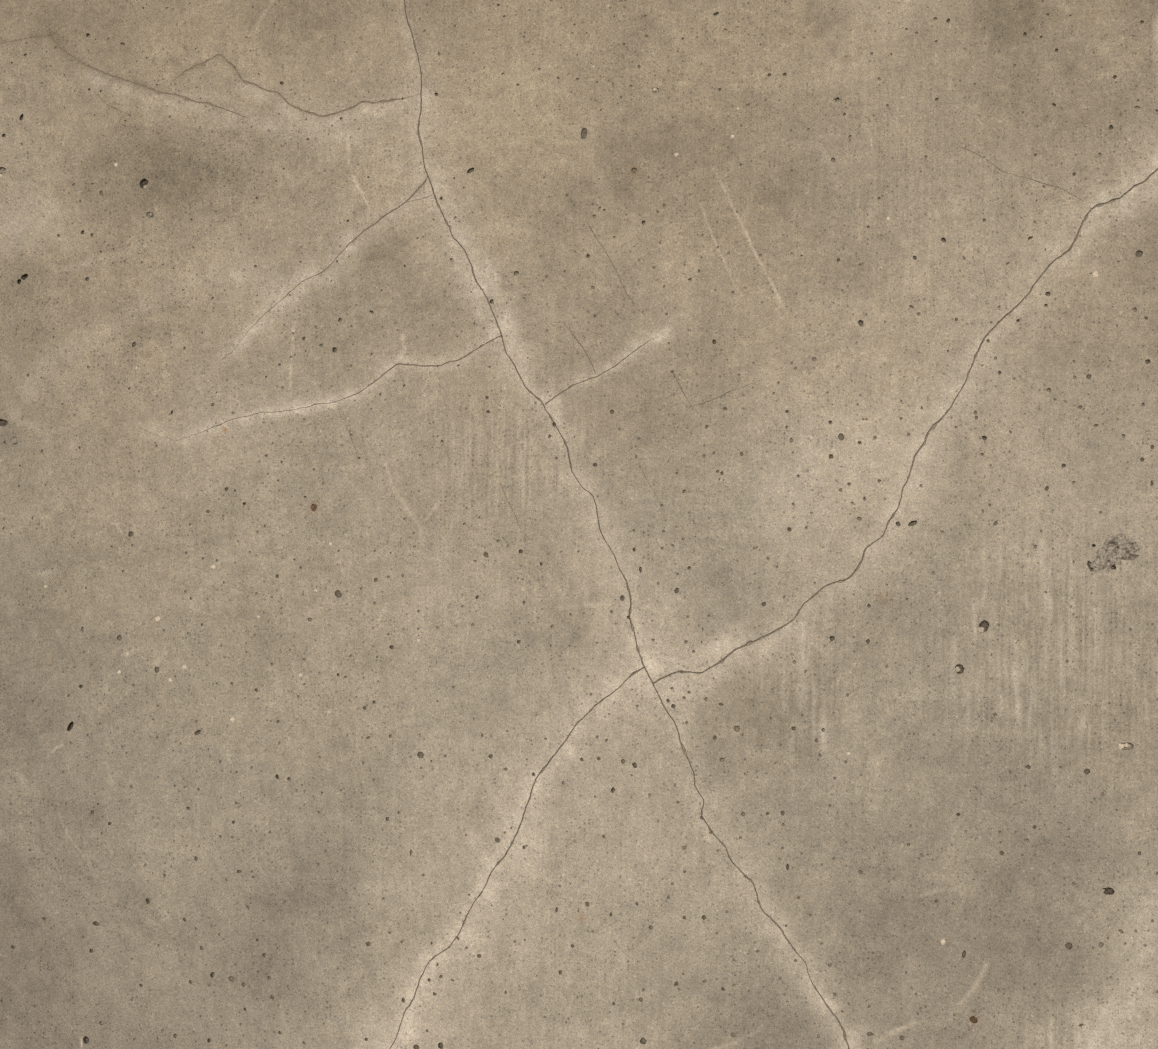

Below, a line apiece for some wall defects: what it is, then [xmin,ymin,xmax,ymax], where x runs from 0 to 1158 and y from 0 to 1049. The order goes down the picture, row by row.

crack [0,27,250,118]
crack [179,54,418,117]
crack [277,0,1158,1049]